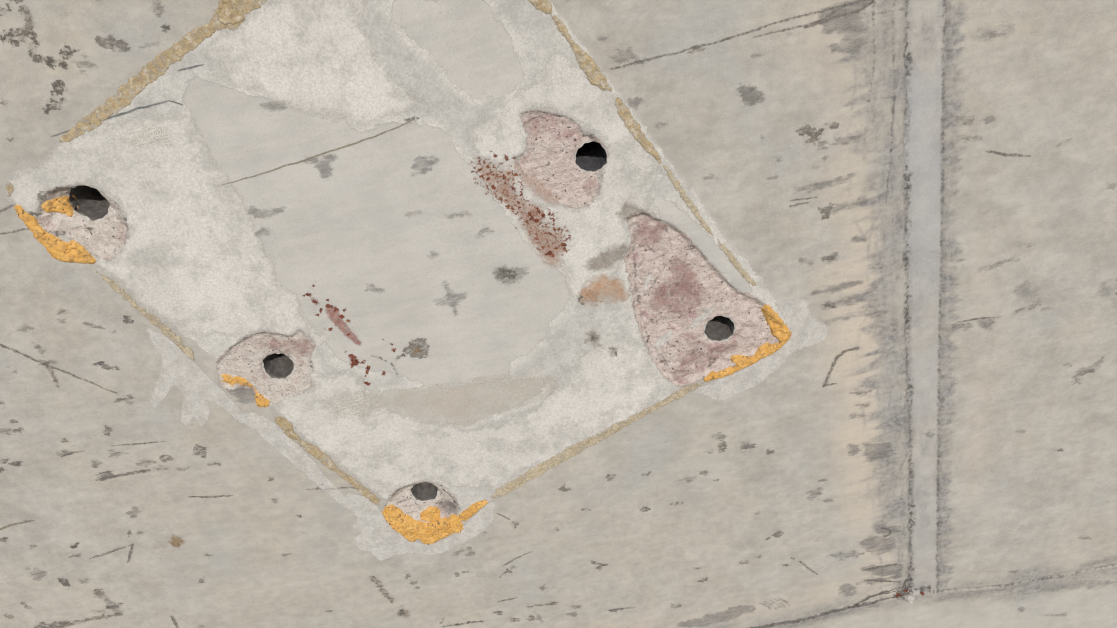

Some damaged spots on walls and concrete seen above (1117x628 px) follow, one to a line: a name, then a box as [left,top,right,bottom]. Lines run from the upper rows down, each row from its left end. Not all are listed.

spalling [29,185,128,261]
rust [471,151,572,264]
spalling [517,110,609,209]
crack [610,0,942,421]
spalling [216,330,315,404]
rust [303,284,398,385]
spalling [591,205,777,386]
spalling [385,481,460,523]